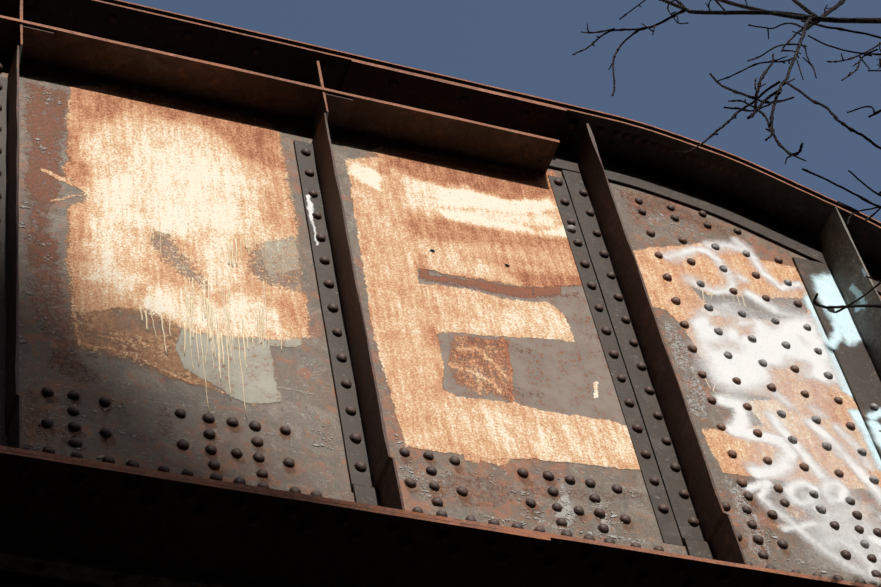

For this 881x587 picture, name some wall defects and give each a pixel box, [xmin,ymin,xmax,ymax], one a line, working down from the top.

corrosion [22,82,213,389]
corrosion [419,269,578,298]
corrosion [447,335,544,402]
corrosion [430,455,642,515]
corrosion [846,501,874,524]